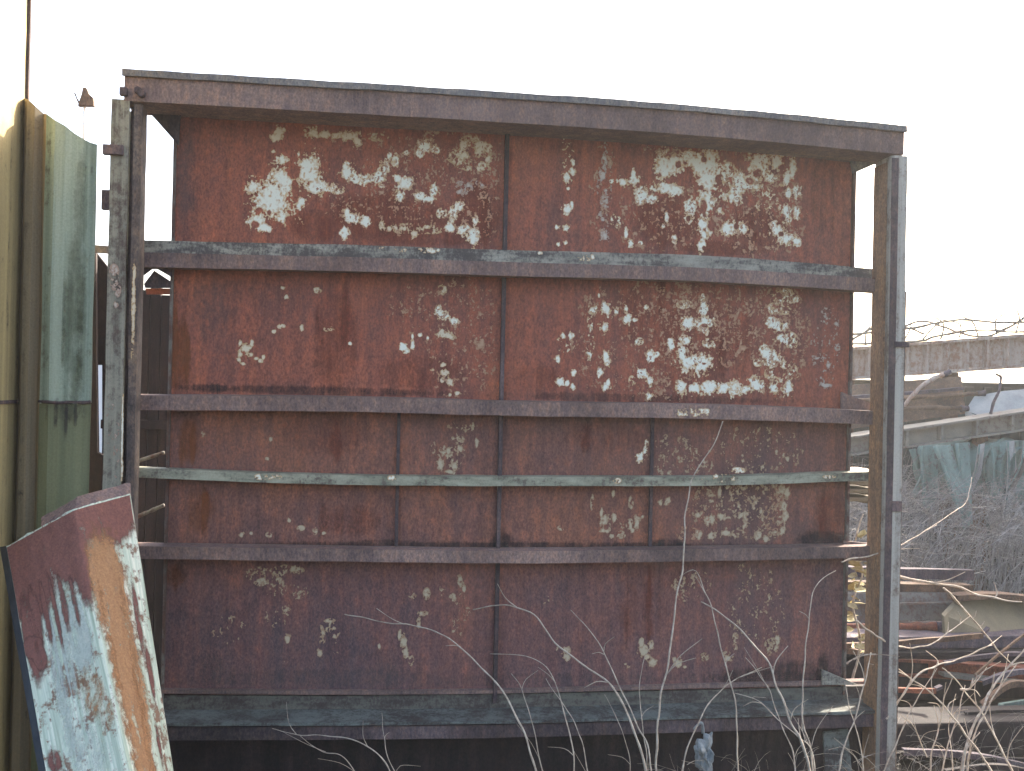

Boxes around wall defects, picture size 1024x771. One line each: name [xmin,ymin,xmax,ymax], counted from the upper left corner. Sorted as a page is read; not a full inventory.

peeling [243,125,504,253]
corrosion [318,198,433,242]
corrosion [445,187,494,244]
peeling [588,142,808,259]
corrosion [640,201,780,255]
peeling [389,276,501,398]
peeling [554,281,840,417]
peeling [590,494,644,539]
peeling [635,427,804,543]
corrosion [7,495,163,771]